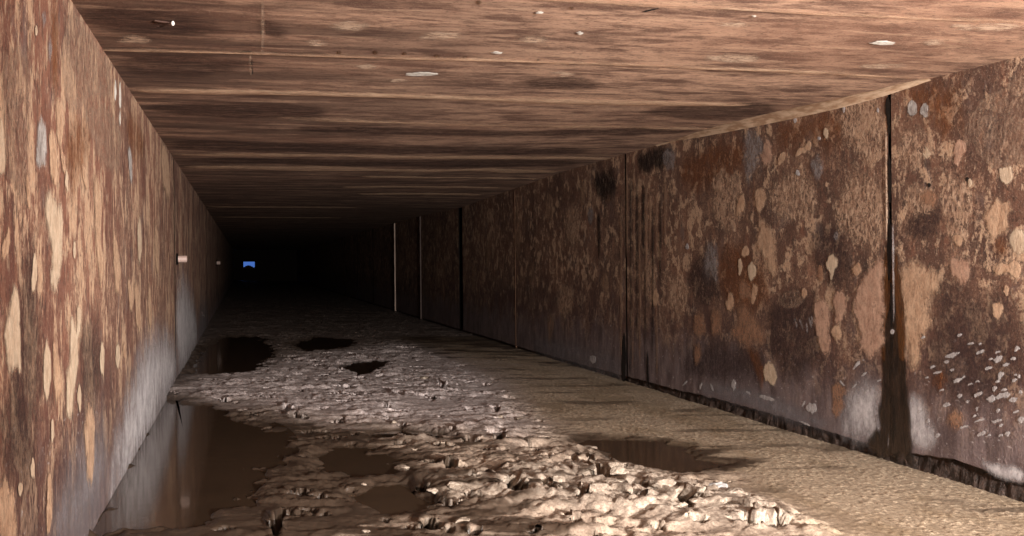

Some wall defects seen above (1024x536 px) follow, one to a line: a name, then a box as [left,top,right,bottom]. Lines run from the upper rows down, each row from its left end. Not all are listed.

rust [723,250,762,307]
damp [845,252,934,460]
damp [985,464,1023,481]